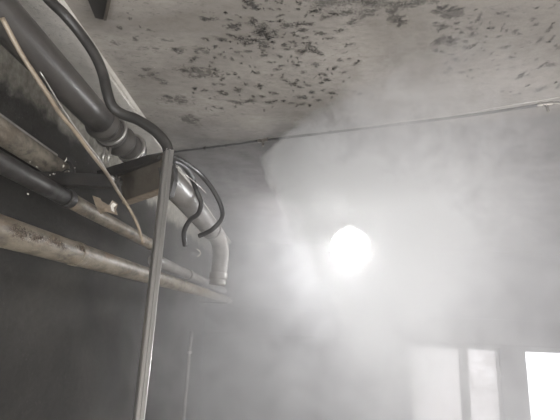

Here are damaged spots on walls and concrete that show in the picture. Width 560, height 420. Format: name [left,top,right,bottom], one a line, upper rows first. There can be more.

water stain [184,0,357,108]
water stain [386,2,405,26]
water stain [433,4,493,62]